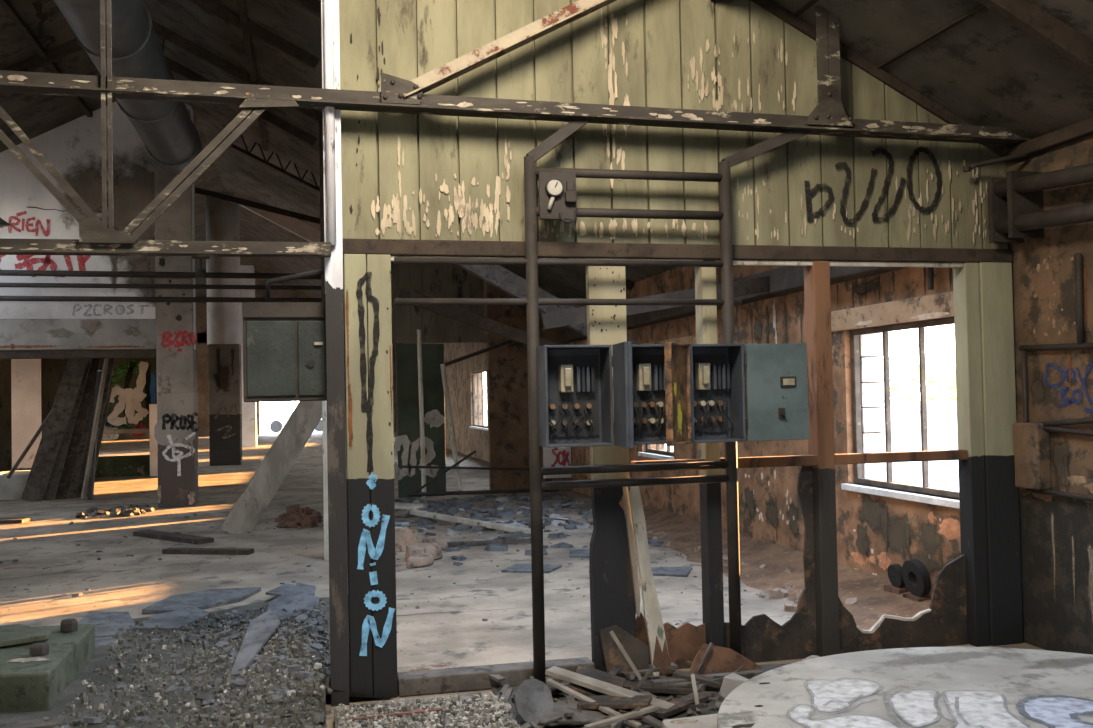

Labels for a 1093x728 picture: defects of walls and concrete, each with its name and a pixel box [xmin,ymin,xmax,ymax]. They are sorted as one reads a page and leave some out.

peeling [600,9,630,189]
peeling [649,33,771,124]
peeling [778,82,796,112]
peeling [371,134,512,238]
leakage [744,487,799,537]
leakage [856,493,961,575]